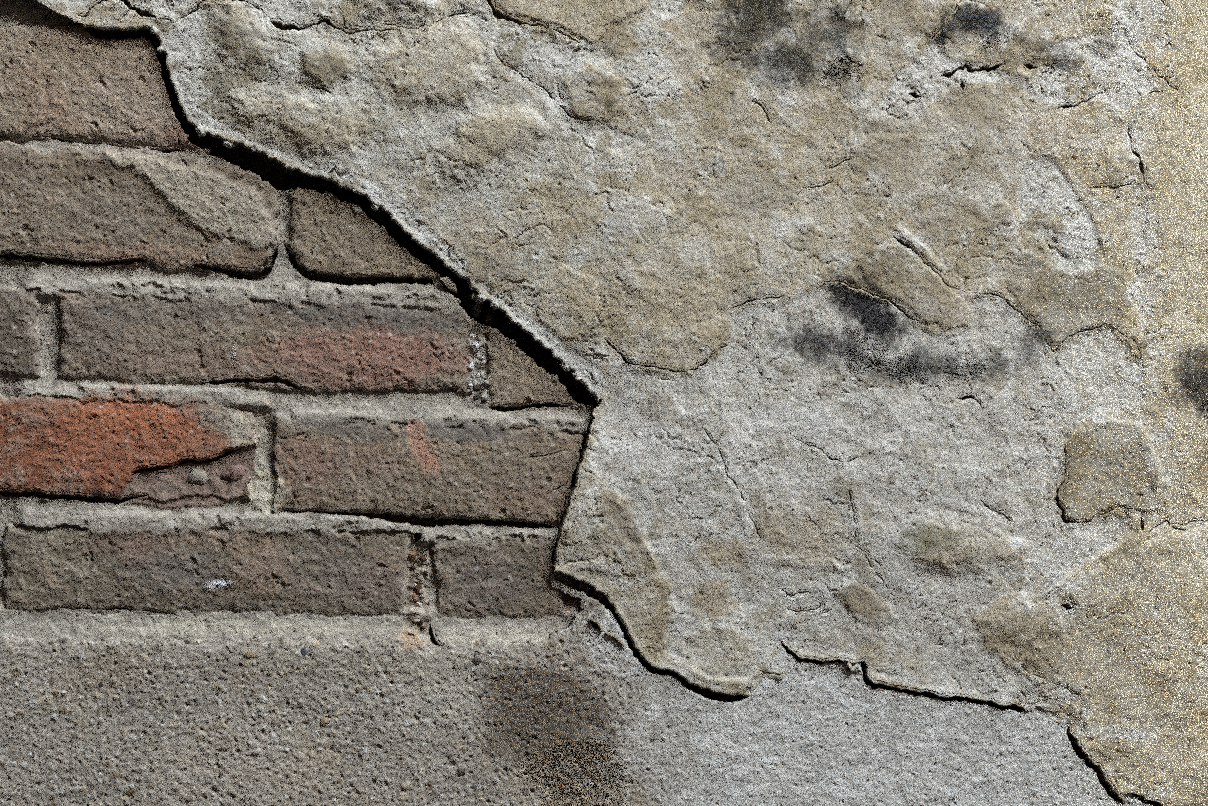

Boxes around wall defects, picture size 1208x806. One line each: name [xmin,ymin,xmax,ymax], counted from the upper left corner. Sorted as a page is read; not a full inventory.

peeling [50,0,97,9]
peeling [131,0,199,17]
peeling [237,0,355,37]
crack [926,0,1007,93]
crack [1056,31,1198,192]
crack [878,230,1145,363]
water stain [793,329,869,361]
water stain [881,347,960,380]
spalling [118,443,257,511]
crack [784,430,895,598]
crack [1053,441,1208,535]
crack [754,641,1165,806]